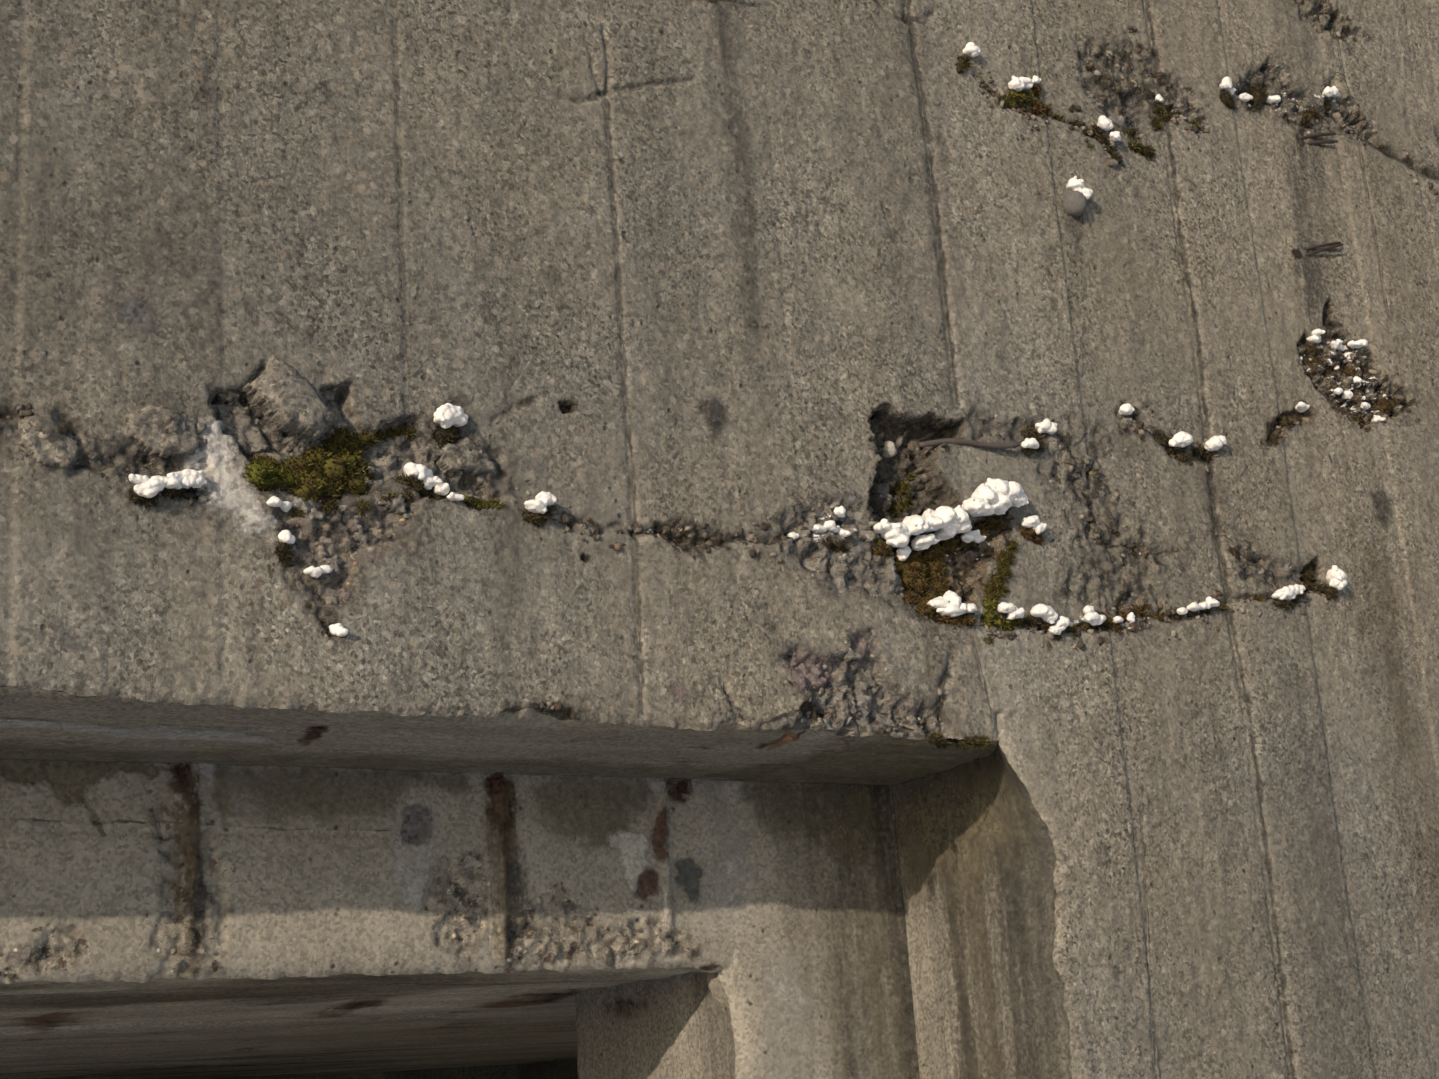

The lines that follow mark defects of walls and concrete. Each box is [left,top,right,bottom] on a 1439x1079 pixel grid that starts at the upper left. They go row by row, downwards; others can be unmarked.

crack [875,0,959,405]
crack [0,402,180,473]
damp [181,417,277,537]
spalling [17,378,537,642]
damp [699,399,726,438]
spalling [778,402,1176,629]
crack [918,2,1330,1079]
spalling [1260,329,1419,454]
corrosion [167,763,206,971]
corrosion [484,772,531,958]
corrosion [667,778,692,803]
damp [696,739,1071,1079]